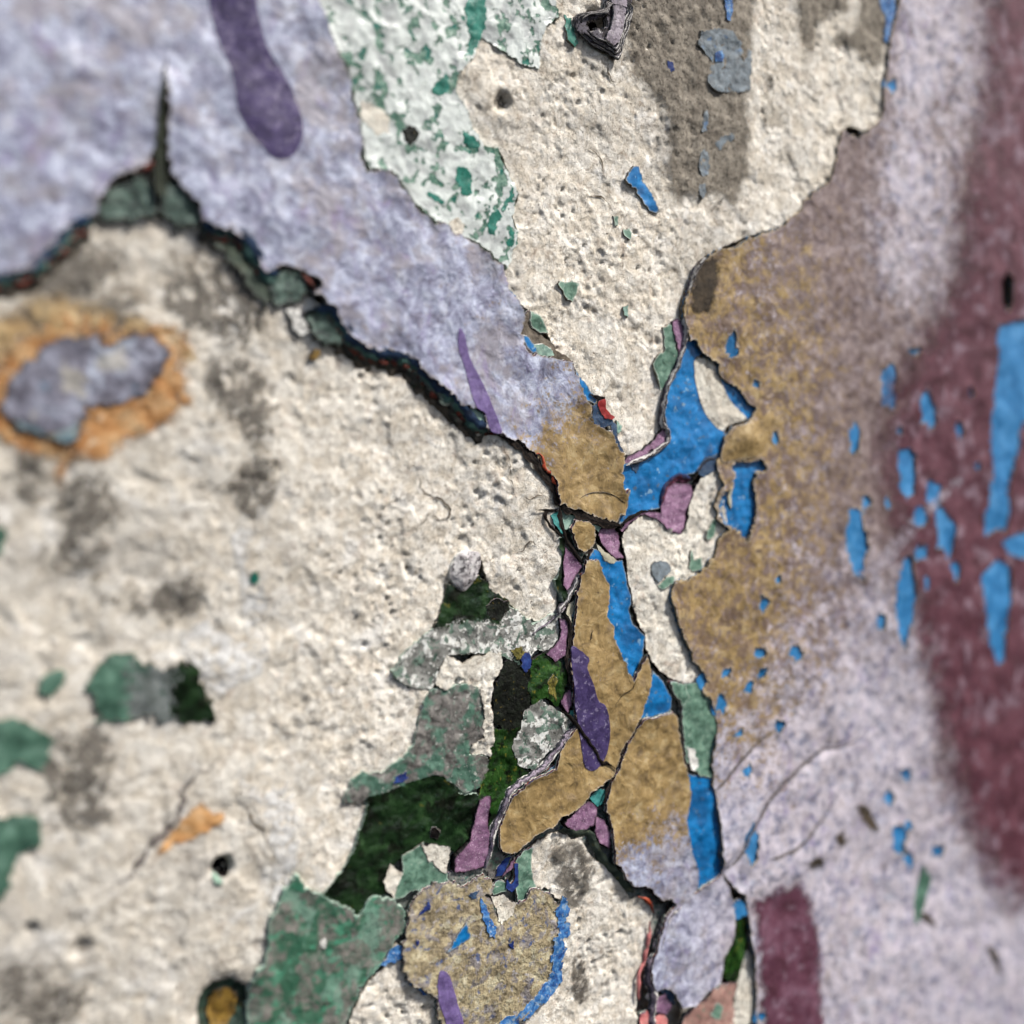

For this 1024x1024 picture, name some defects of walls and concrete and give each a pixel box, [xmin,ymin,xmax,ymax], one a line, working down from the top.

crack [155,54,168,196]
spalling [319,0,897,473]
spalling [0,162,779,1024]
crack [412,464,451,529]
crack [500,436,656,564]
peeling [845,495,871,582]
peeling [876,447,960,650]
peeling [981,320,1024,664]
crack [560,613,643,888]
crack [615,653,648,705]
crack [93,755,221,899]
peeling [892,819,943,926]